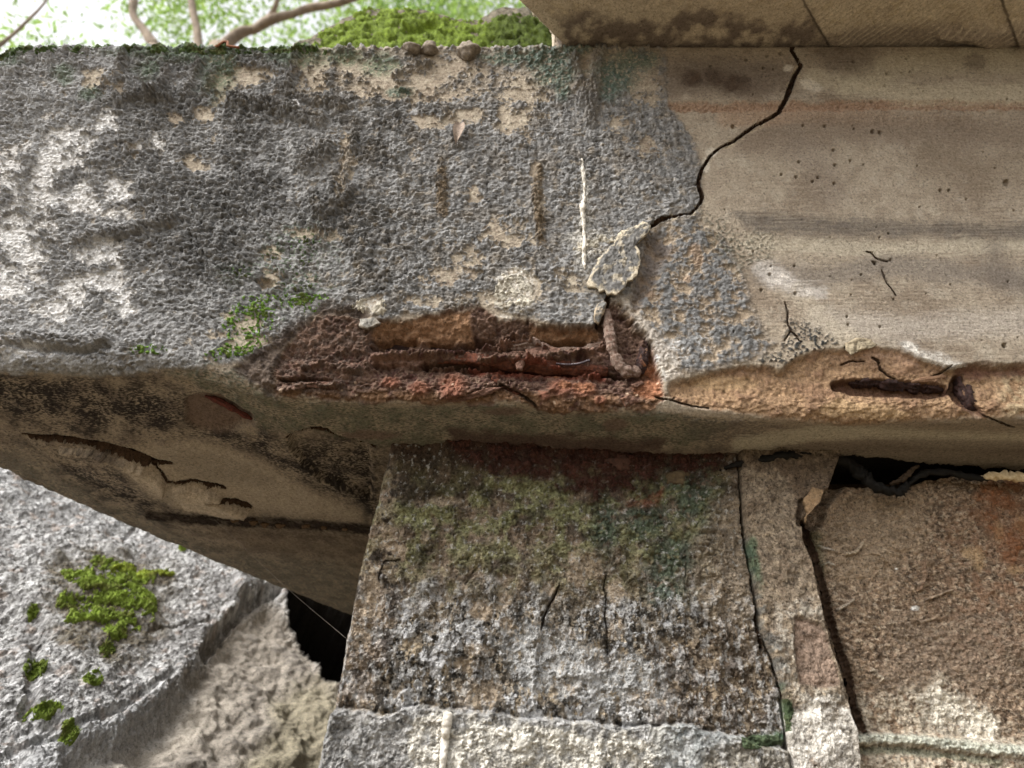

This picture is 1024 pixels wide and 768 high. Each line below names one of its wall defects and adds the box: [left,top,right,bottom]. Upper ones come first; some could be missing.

crack [650,47,803,228]
spalling [271,221,1024,425]
crack [738,478,797,697]
crack [799,523,867,733]